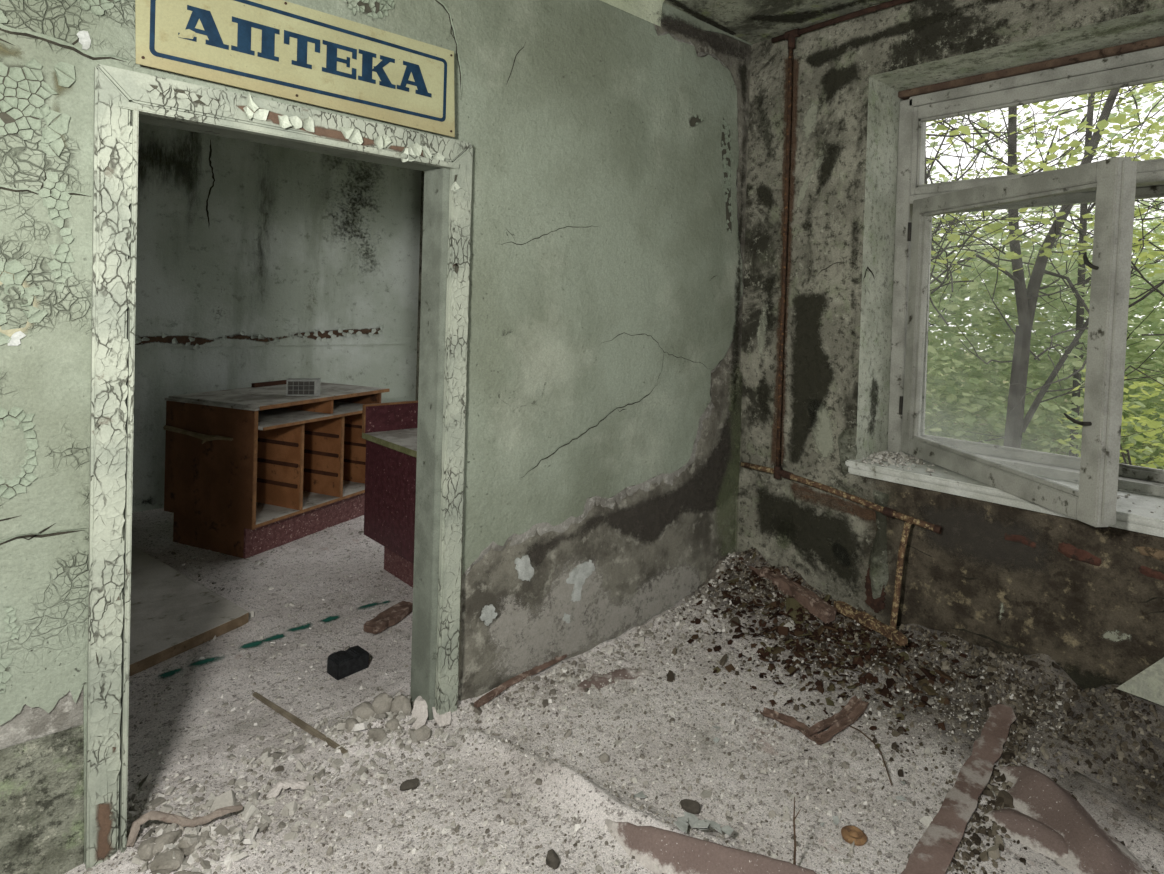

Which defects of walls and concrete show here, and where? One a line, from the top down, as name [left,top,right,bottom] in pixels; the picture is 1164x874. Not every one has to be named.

peeling [0,45,76,156]
leakage [137,132,193,189]
peeling [141,82,445,162]
crack [435,0,462,97]
crack [501,226,598,245]
corrosion [771,59,799,464]
flaking render [440,22,751,714]
crack [521,333,710,478]
leakage [790,293,835,463]
peeling [0,100,384,874]
leakage [757,489,859,594]
corrosion [791,482,876,521]